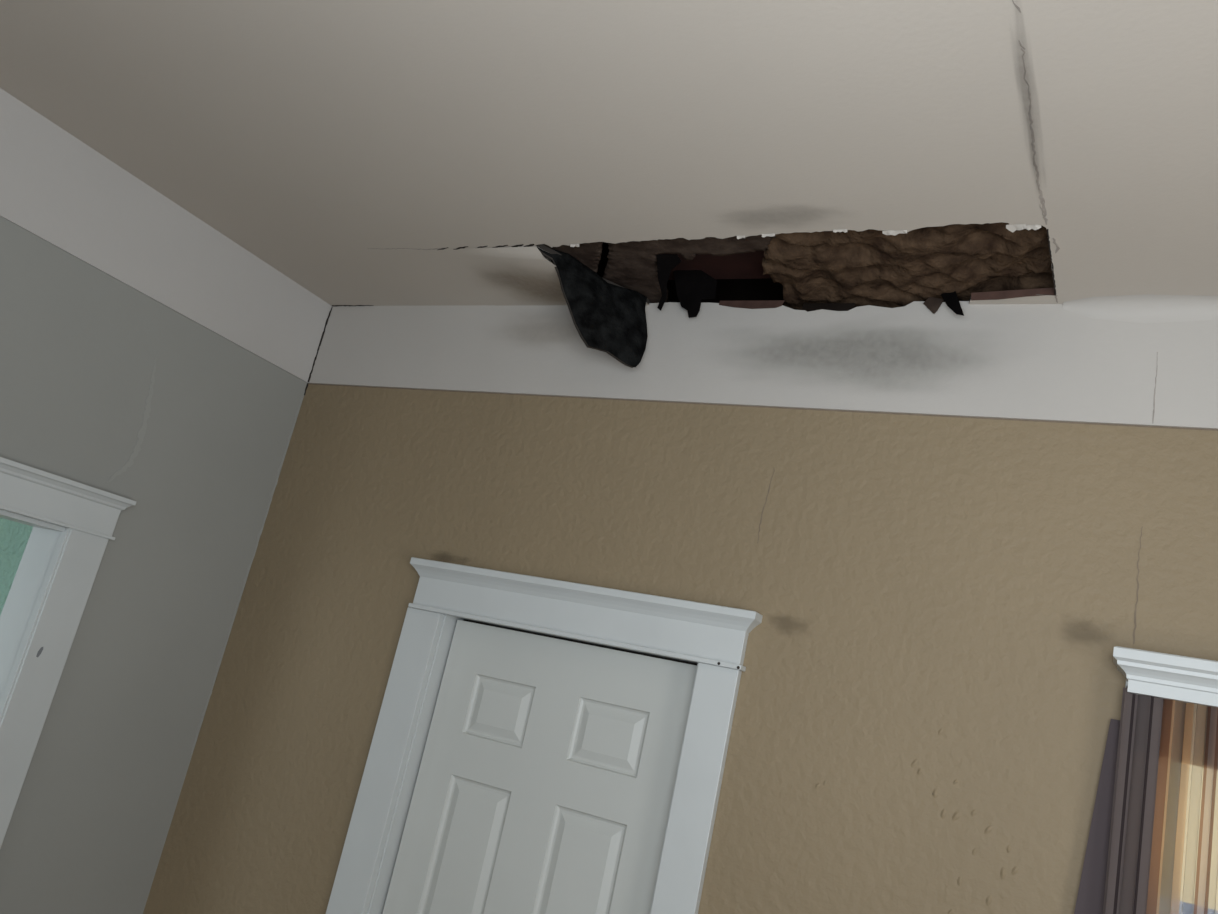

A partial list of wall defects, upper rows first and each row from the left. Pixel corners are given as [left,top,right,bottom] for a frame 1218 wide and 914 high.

crack [1012,0,1060,303]
crack [368,243,534,251]
spalling [762,222,1054,310]
crack [1133,526,1143,644]